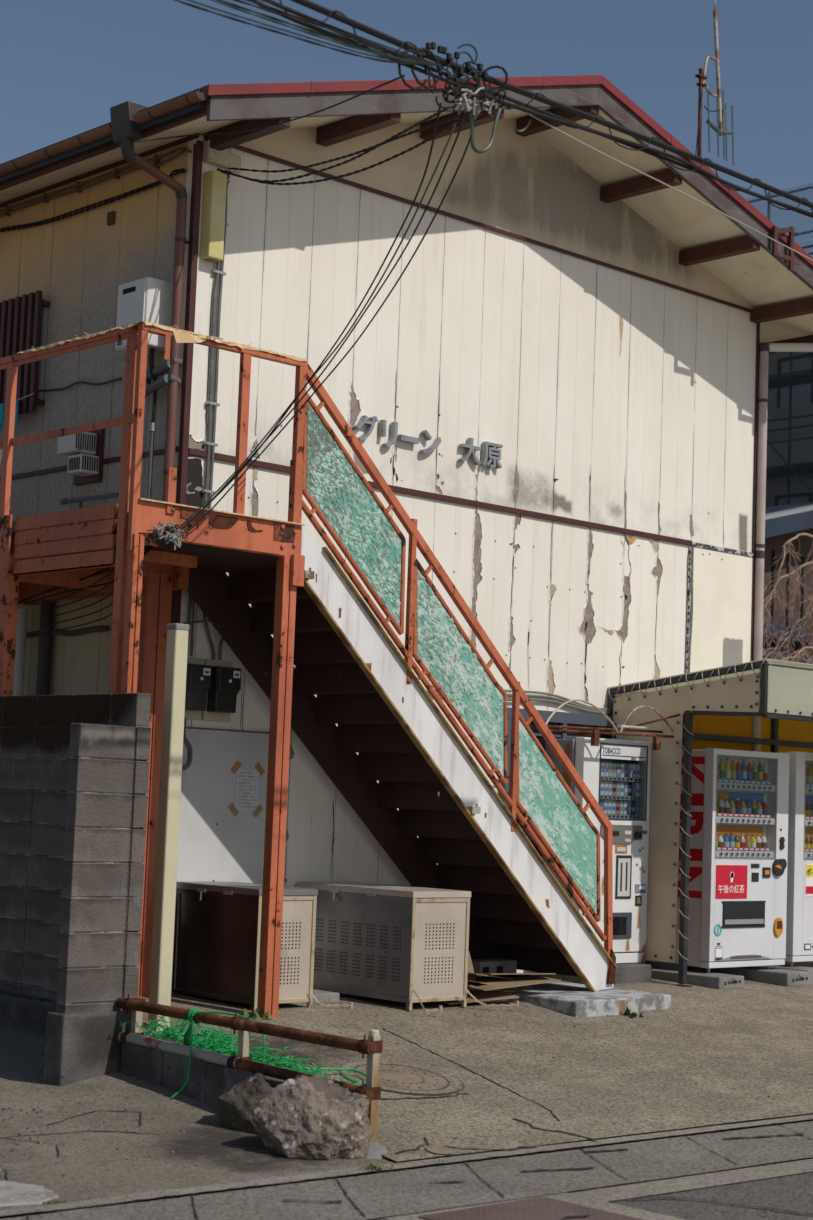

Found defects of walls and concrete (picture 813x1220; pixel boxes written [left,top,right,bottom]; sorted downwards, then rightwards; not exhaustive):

damp [451,158,679,267]
rust [140,532,161,547]
rust [181,508,295,542]
peeling [311,383,401,616]
peeling [418,467,505,761]
damp [512,478,571,512]
spalling [578,527,597,644]
spalling [616,491,663,643]
crack [0,1028,813,1220]